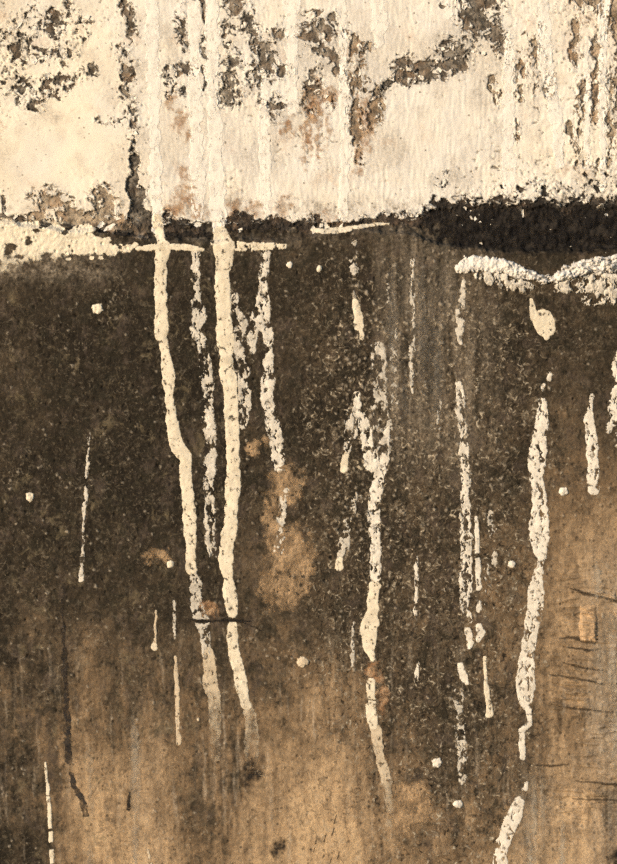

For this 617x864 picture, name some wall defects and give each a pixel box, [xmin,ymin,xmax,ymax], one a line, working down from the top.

peeling [0,0,209,272]
flaking render [218,0,617,234]
damp [0,201,617,864]